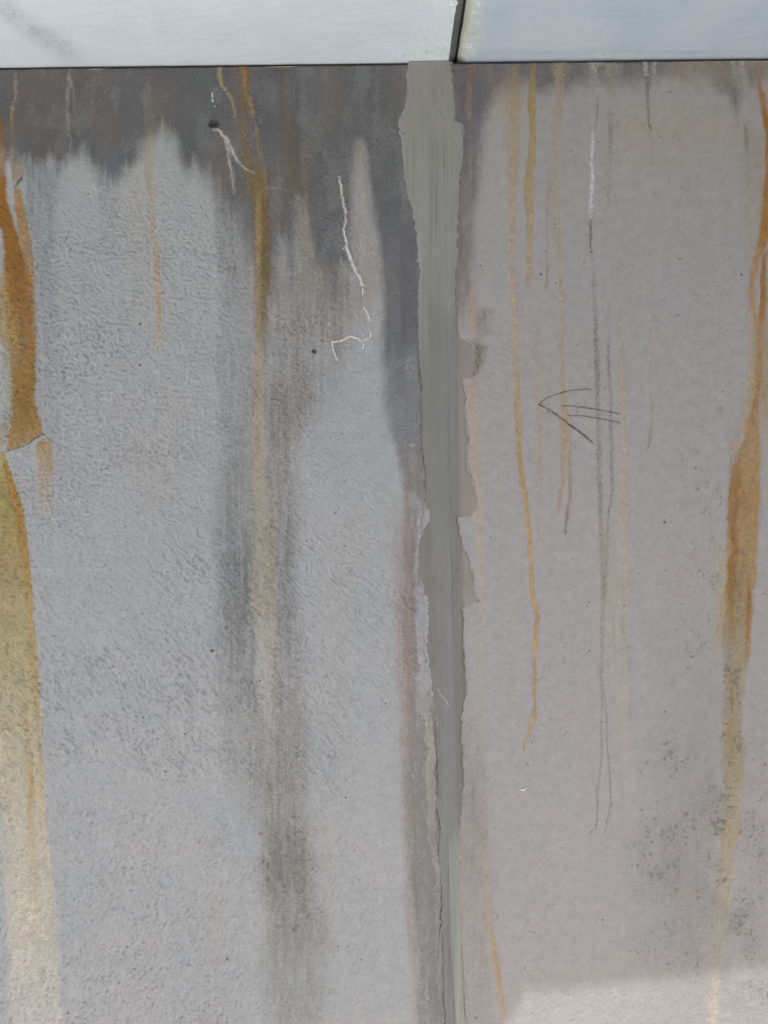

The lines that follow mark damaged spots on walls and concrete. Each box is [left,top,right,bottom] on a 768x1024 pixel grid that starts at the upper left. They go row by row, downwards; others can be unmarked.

rust [0,161,52,829]
damp [0,65,443,1024]
rust [242,127,269,349]
crack [331,179,372,361]
rust [507,63,536,283]
rust [512,339,540,748]
rust [716,87,768,670]